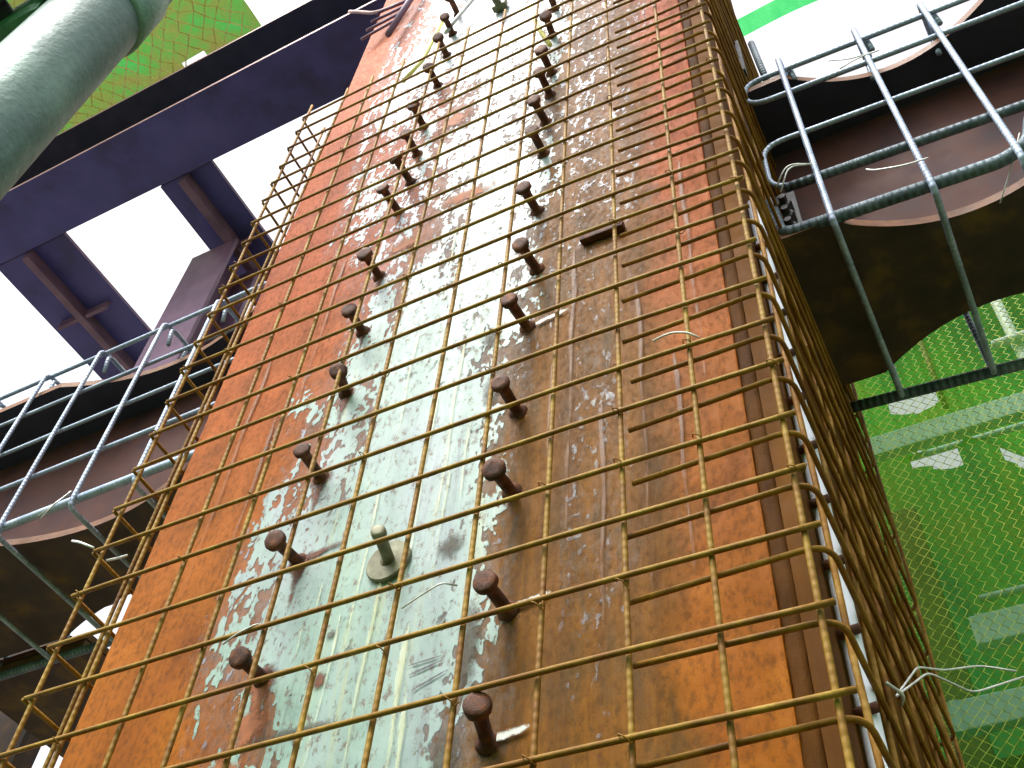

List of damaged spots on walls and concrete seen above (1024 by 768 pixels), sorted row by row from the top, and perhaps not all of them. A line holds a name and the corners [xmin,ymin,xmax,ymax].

rust [446,181,494,205]
rust [678,163,693,281]
rust [228,356,273,473]
rust [337,389,354,425]
peeling [199,0,637,768]
rust [673,355,684,459]
rust [233,420,275,537]
rust [310,472,331,509]
rust [287,542,341,603]
peeling [192,705,206,746]
rust [234,666,274,749]